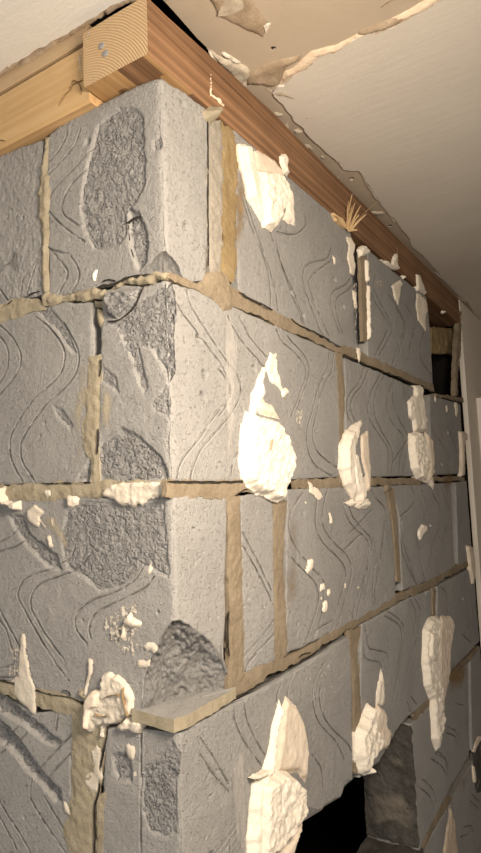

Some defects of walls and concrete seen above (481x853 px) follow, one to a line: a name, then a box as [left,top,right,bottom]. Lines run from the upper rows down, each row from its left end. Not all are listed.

peeling [1,0,137,76]
peeling [207,0,441,99]
leakage [265,353,289,398]
crack [35,687,130,853]
spalling [362,724,420,848]